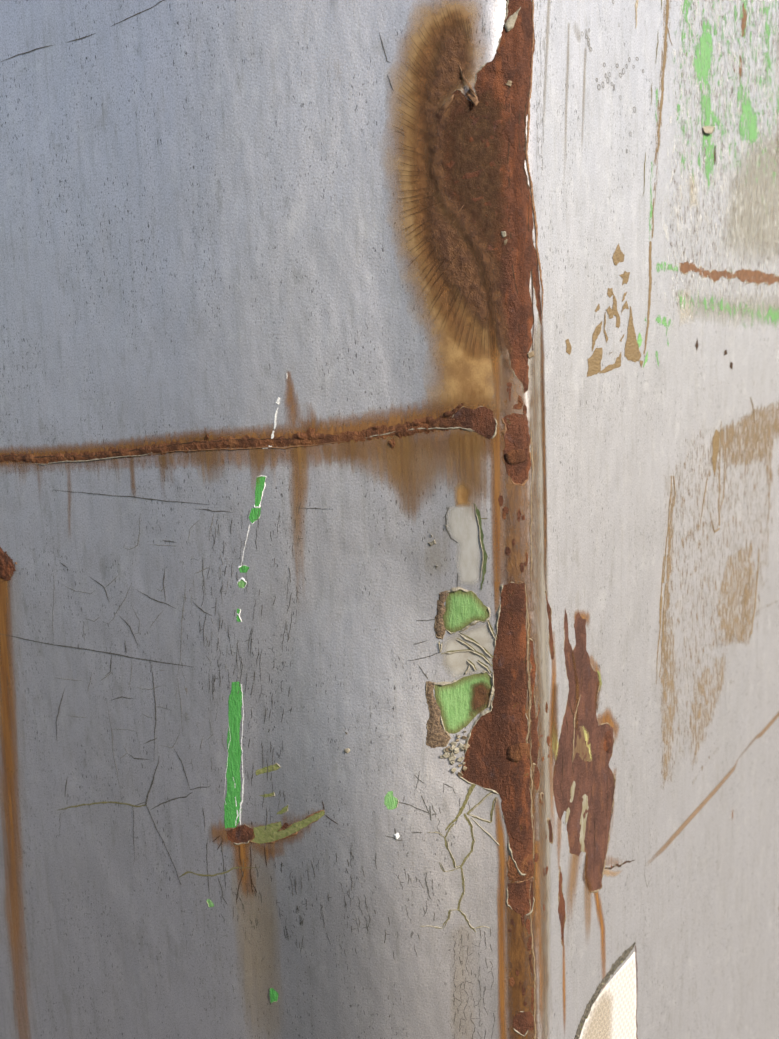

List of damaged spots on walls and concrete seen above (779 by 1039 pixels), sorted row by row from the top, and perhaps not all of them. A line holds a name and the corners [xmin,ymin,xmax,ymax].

corrosion [0,551,21,976]
crack [2,483,499,1039]
leakage [0,374,503,531]
peeling [407,572,498,777]
corrosion [393,0,626,1039]
peeling [587,244,643,377]
peeling [656,0,779,367]